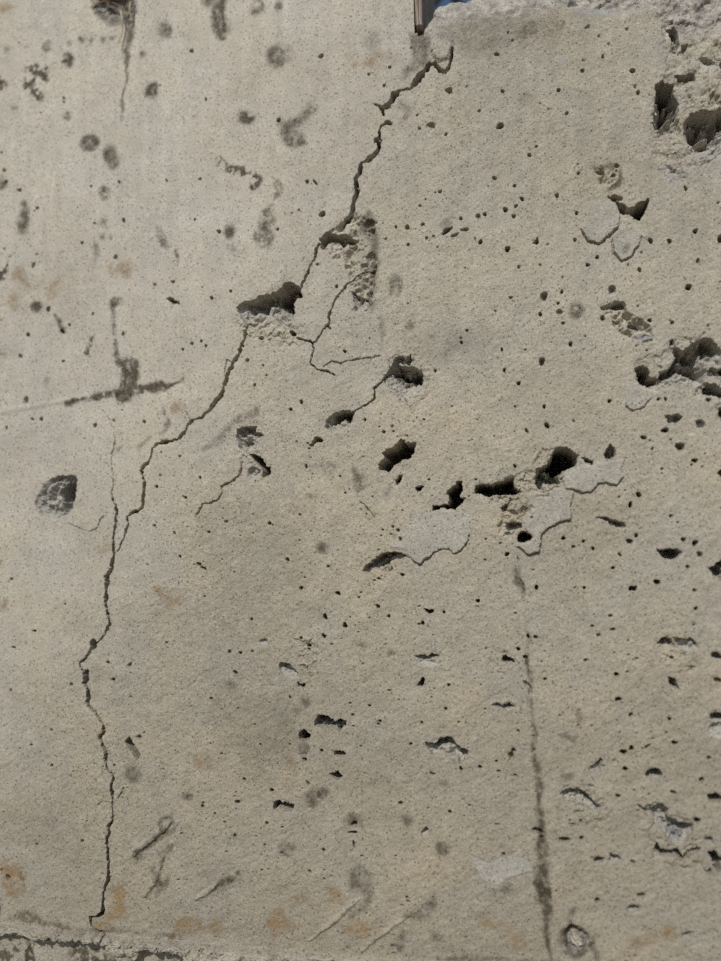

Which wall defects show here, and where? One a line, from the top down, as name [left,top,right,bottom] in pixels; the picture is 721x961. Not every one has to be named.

crack [345,46,454,224]
spalling [417,0,721,194]
crack [300,242,320,289]
spalling [319,212,380,314]
crack [304,284,380,376]
spalling [599,285,655,342]
crack [355,381,383,411]
spalling [624,332,721,425]
peeling [390,506,474,563]
crack [407,535,470,567]
spalling [473,445,625,554]
crack [67,334,246,959]